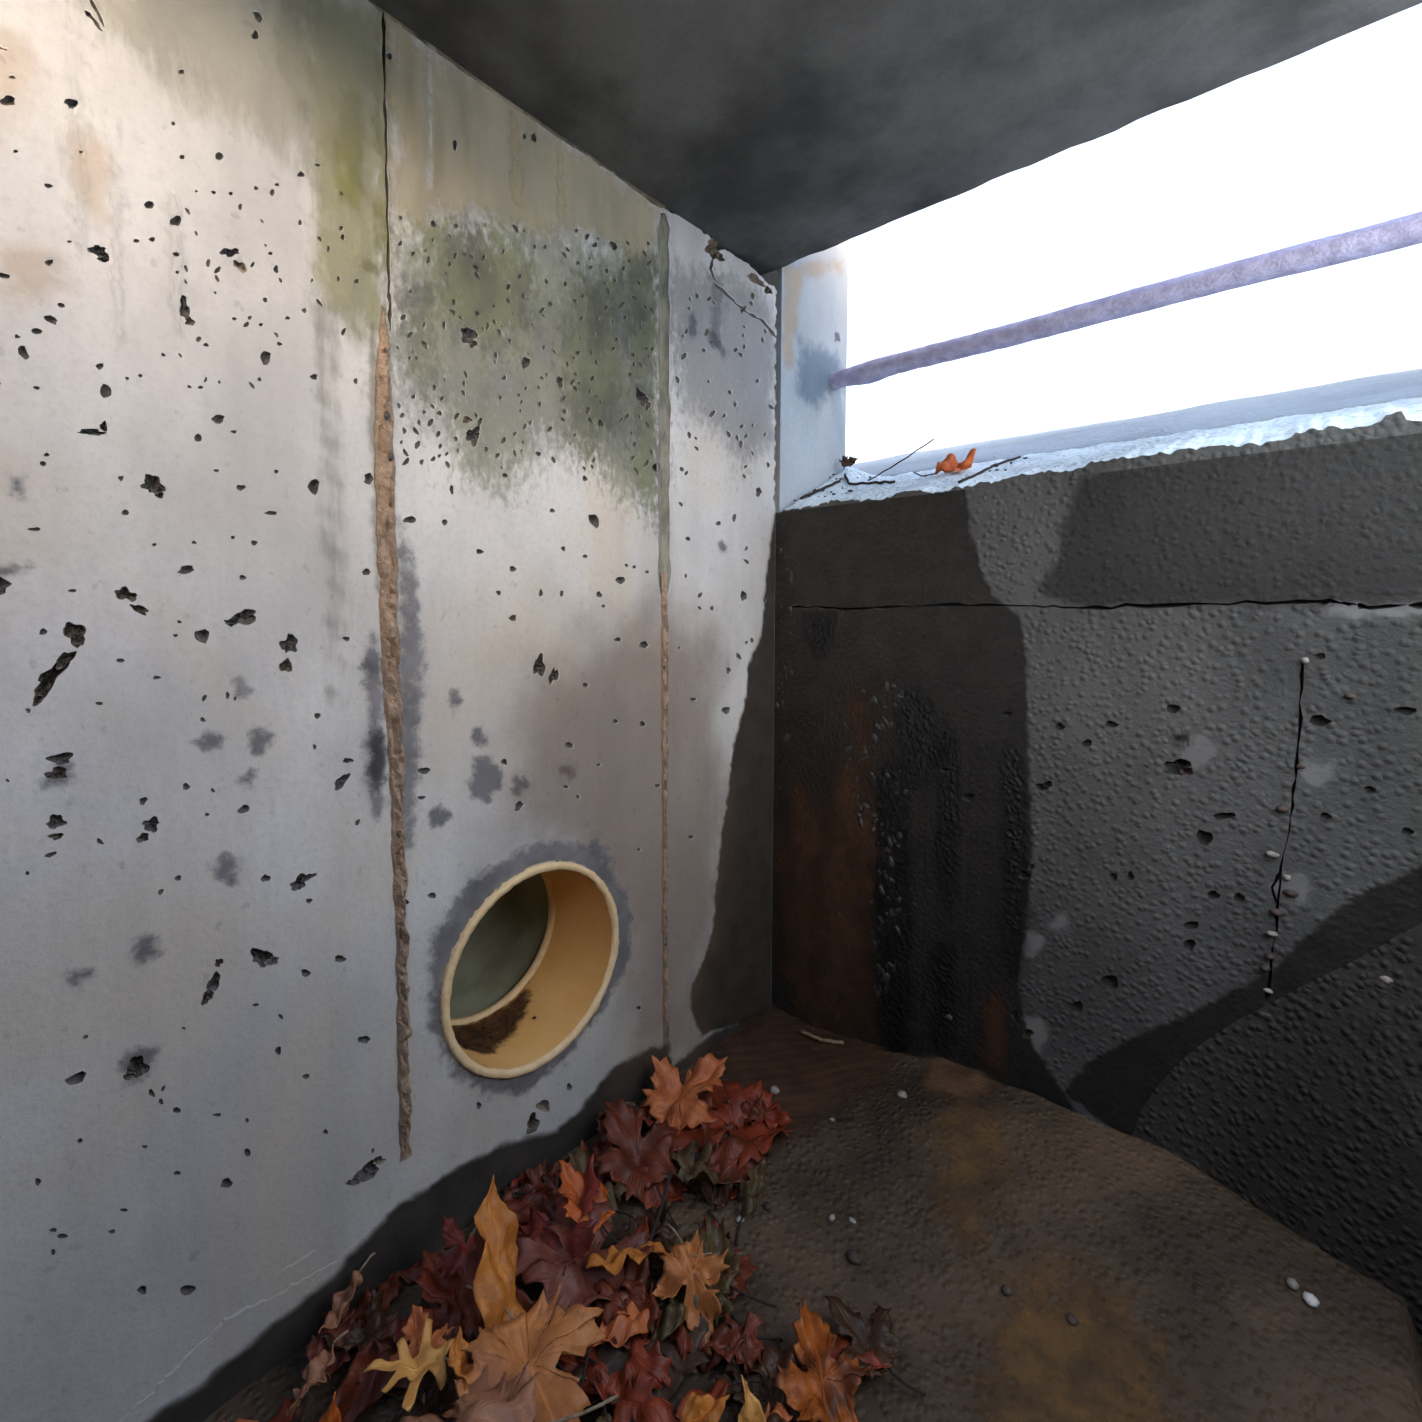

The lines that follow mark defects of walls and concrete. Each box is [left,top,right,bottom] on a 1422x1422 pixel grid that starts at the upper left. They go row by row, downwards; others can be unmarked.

crack [791,598,1422,611]
water stain [136,937,156,959]
water stain [149,489,1422,1422]
crack [1258,657,1309,1018]